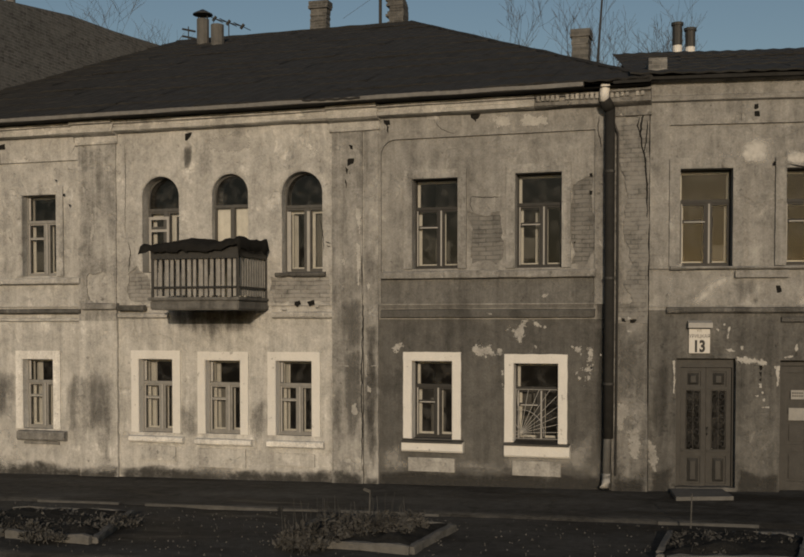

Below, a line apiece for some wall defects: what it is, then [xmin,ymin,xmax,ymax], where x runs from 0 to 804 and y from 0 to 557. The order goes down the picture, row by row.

spalling [468,211,504,265]
spalling [571,173,595,265]
crack [637,115,650,305]
damp [175,311,251,331]
damp [347,353,359,422]
damp [367,330,376,448]
peeling [472,344,502,358]
peeling [506,319,546,343]
peeling [716,323,799,408]
damp [0,432,603,490]
peeling [613,403,659,472]
damp [738,472,777,492]